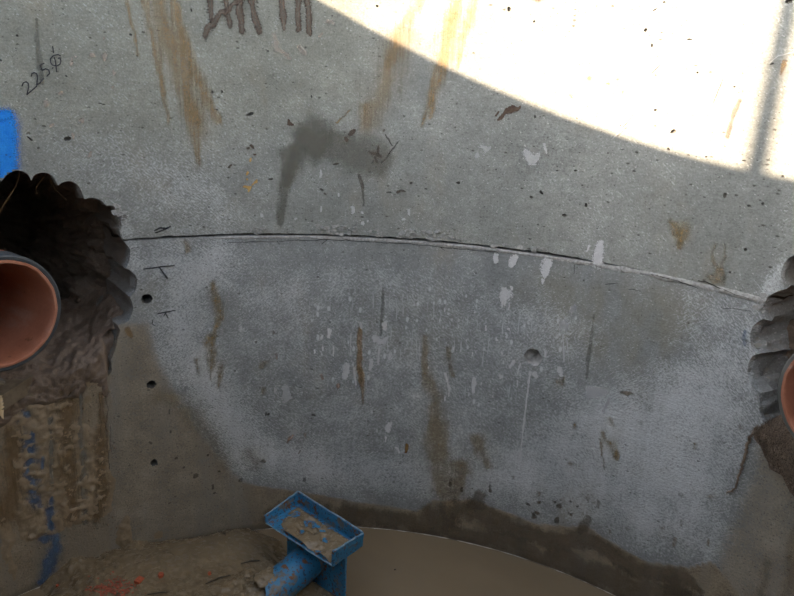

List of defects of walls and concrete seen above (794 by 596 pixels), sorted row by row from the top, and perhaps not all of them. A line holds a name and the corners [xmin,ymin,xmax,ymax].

corrosion [141,0,222,163]
corrosion [422,0,476,123]
crack [121,233,500,253]
crack [651,274,749,311]